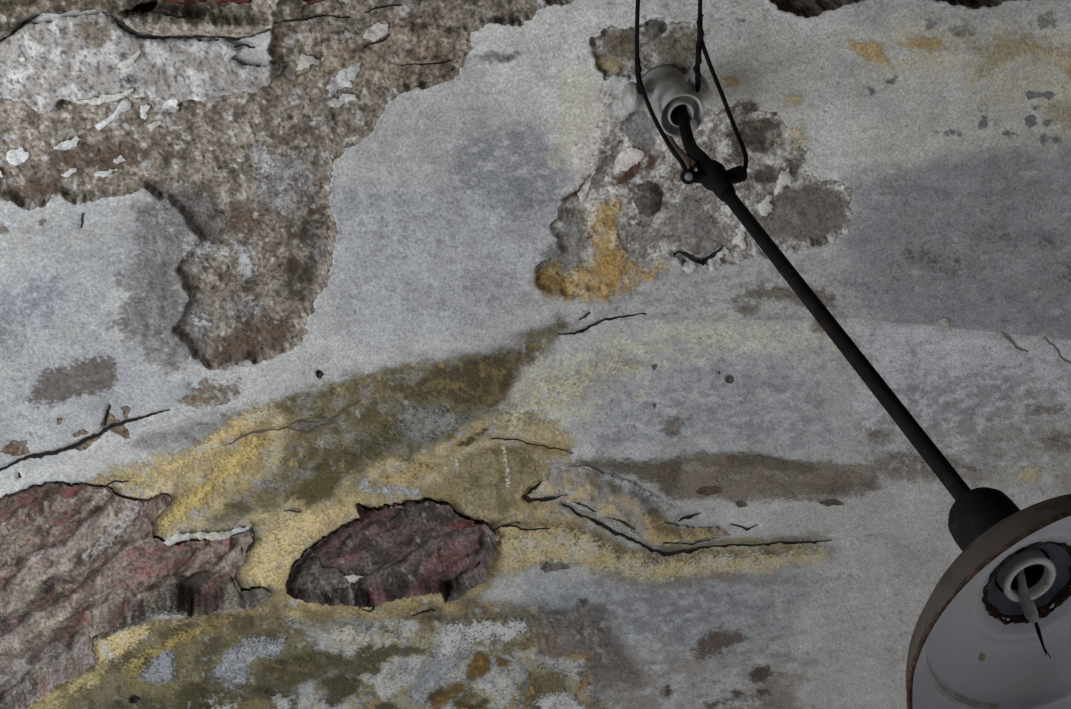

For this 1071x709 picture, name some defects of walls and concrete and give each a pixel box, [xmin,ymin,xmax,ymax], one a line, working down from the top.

crack [0,14,40,43]
crack [101,4,402,48]
flaking render [769,0,866,18]
flaking render [935,0,1031,9]
flaking render [534,18,852,301]
flaking render [0,0,574,409]
crack [1001,332,1071,364]
crack [0,405,170,478]
damp [26,196,937,709]
spalling [286,497,497,610]
crack [489,481,832,557]
spalling [0,481,271,709]